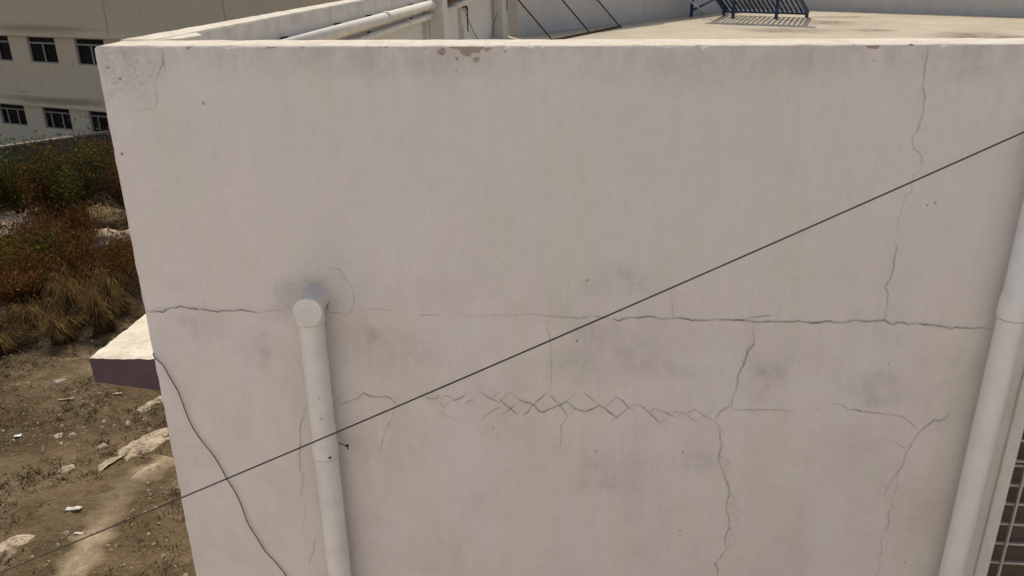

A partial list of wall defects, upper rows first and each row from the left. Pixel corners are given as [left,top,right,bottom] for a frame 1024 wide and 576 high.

peeling [437,46,506,71]